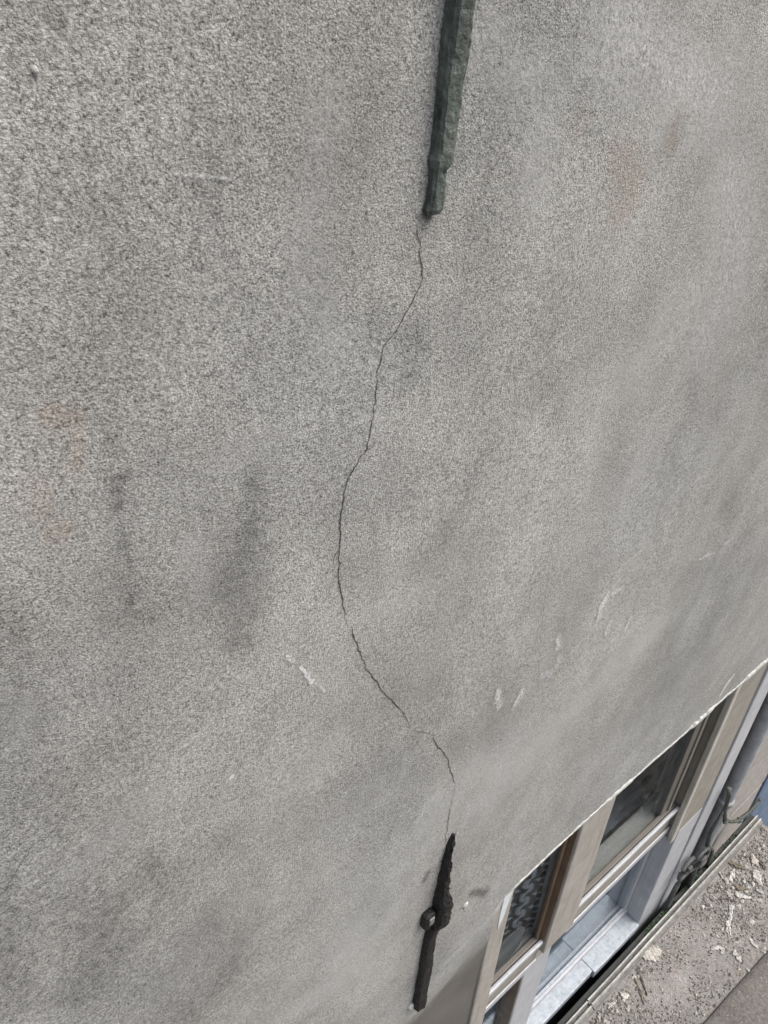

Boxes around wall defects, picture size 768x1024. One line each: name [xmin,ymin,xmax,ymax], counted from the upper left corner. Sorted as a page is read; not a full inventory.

crack [333,224,455,845]